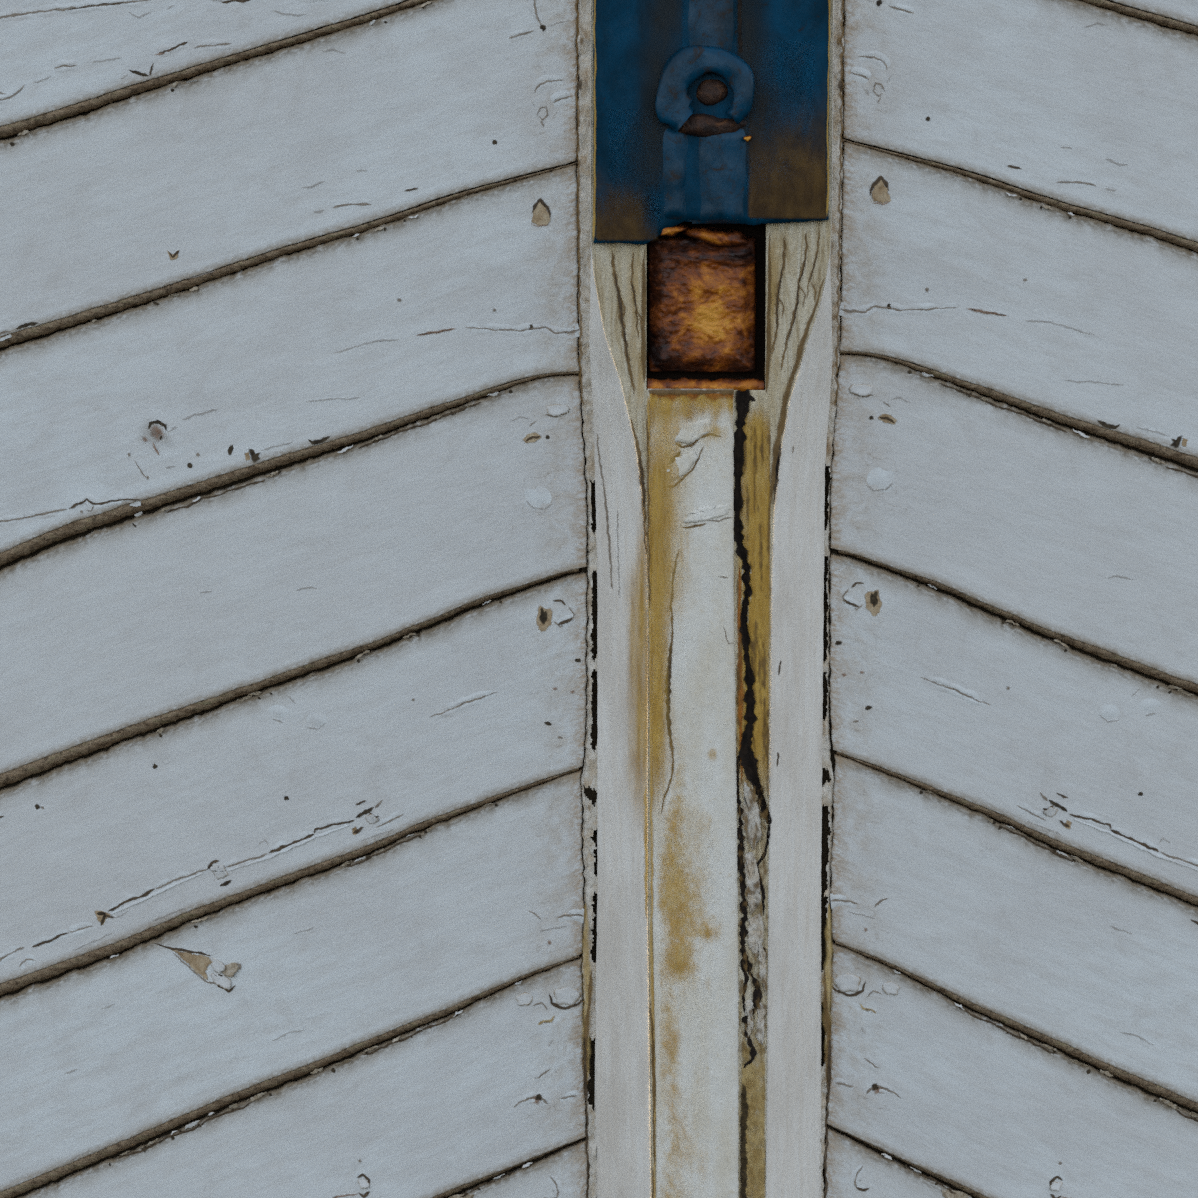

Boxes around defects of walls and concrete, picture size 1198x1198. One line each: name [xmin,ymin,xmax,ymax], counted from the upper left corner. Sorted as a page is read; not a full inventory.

crack [0,0,177,22]
crack [418,0,584,405]
peeling [667,419,713,482]
crack [773,442,794,502]
crack [597,435,612,588]
peeling [684,504,731,523]
crack [611,252,781,1068]
corrosion [596,198,824,1198]
crack [1015,801,1198,871]
crack [0,810,405,969]
spalling [154,943,241,993]
peeling [449,1162,533,1198]